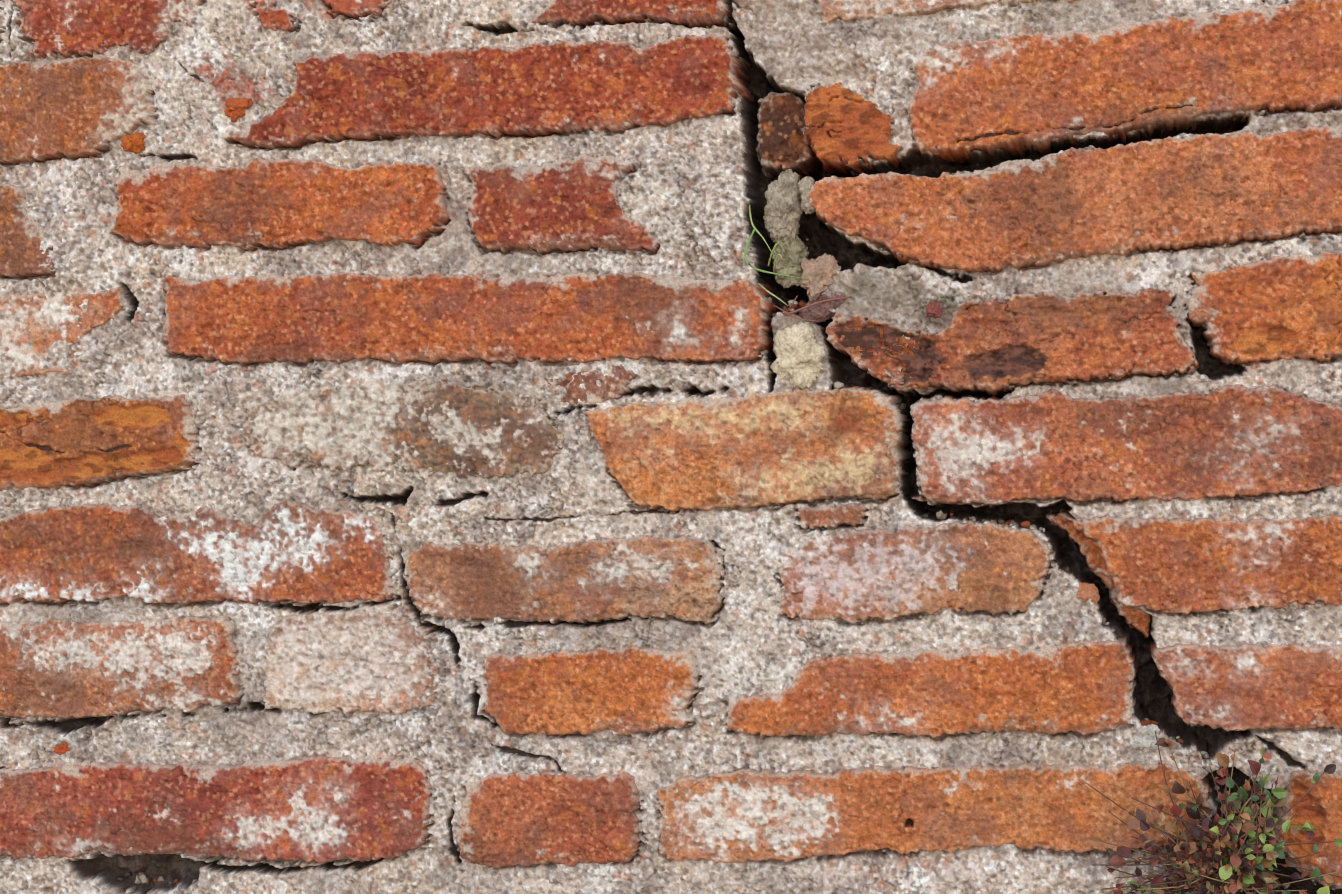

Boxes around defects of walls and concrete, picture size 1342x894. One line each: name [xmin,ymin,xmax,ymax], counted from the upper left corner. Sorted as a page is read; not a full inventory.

crack [462,21,656,36]
crack [555,381,735,415]
crack [706,0,1342,894]
crack [268,486,680,773]
crack [445,796,462,865]